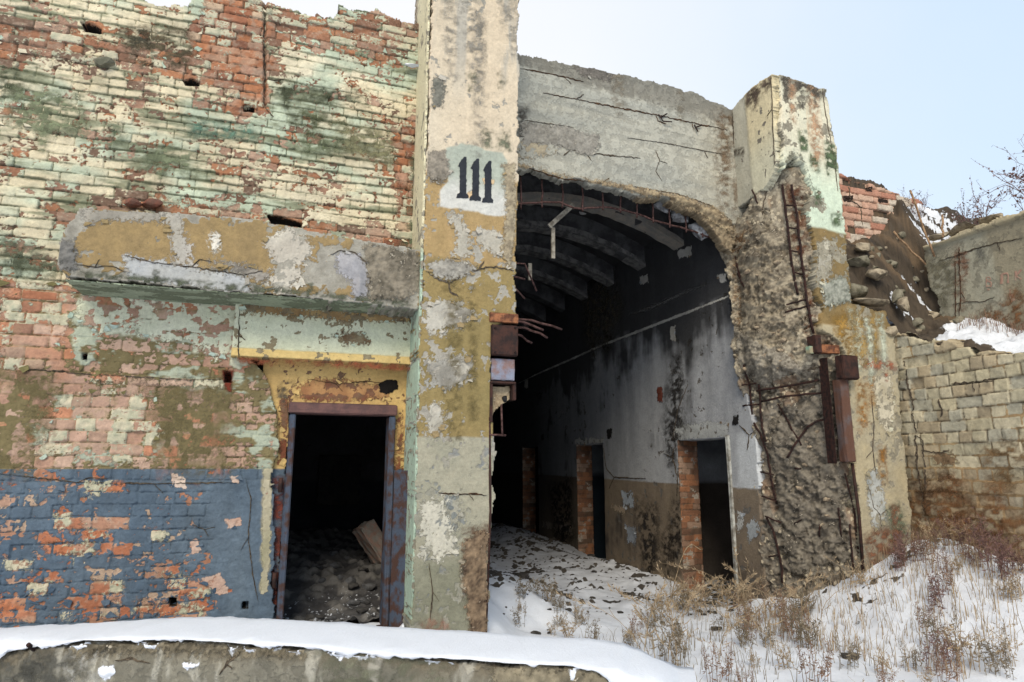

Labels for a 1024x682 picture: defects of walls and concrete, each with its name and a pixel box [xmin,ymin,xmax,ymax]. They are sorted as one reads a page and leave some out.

peeling [0,22,167,69]
crack [263,16,283,117]
peeling [194,0,418,113]
spalling [430,74,448,109]
crack [520,68,734,221]
spalling [0,120,851,373]
peeling [423,353,478,439]
spalling [489,386,510,436]
peeling [82,480,129,498]
peeling [0,512,228,623]
corrosion [271,479,284,612]
spalling [417,492,489,632]